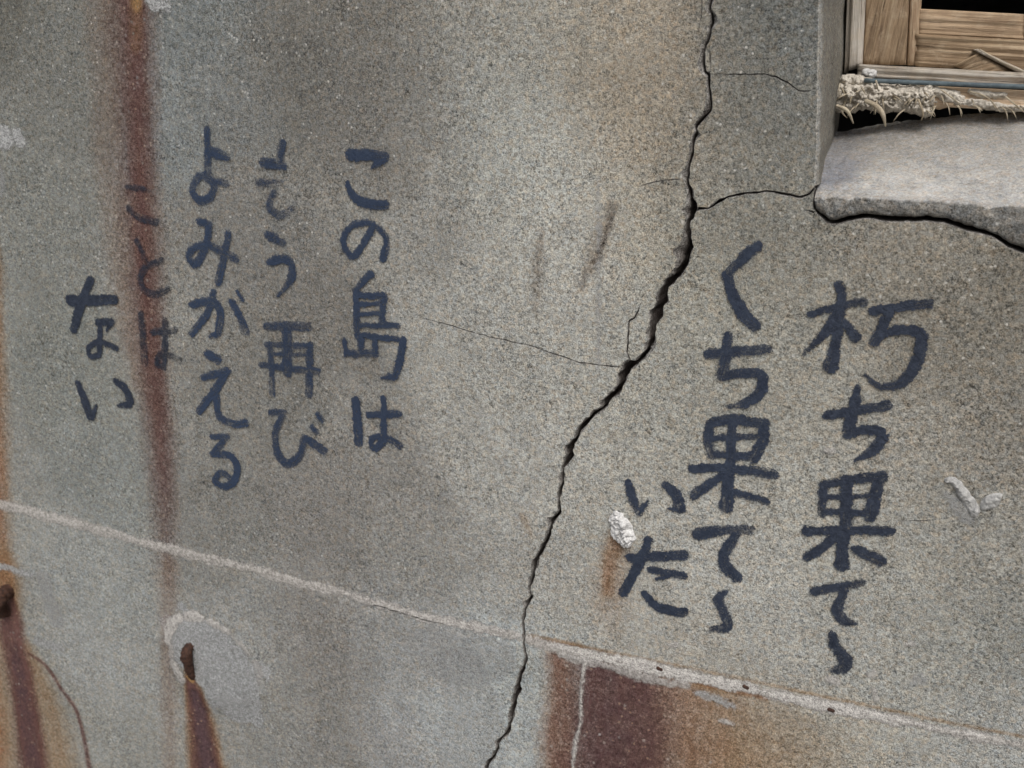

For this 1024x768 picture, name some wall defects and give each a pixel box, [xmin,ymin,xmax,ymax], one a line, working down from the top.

corrosion [0,380,91,768]
corrosion [113,0,171,520]
corrosion [184,672,224,768]
corrosion [533,637,768,768]
crack [419,0,1024,768]